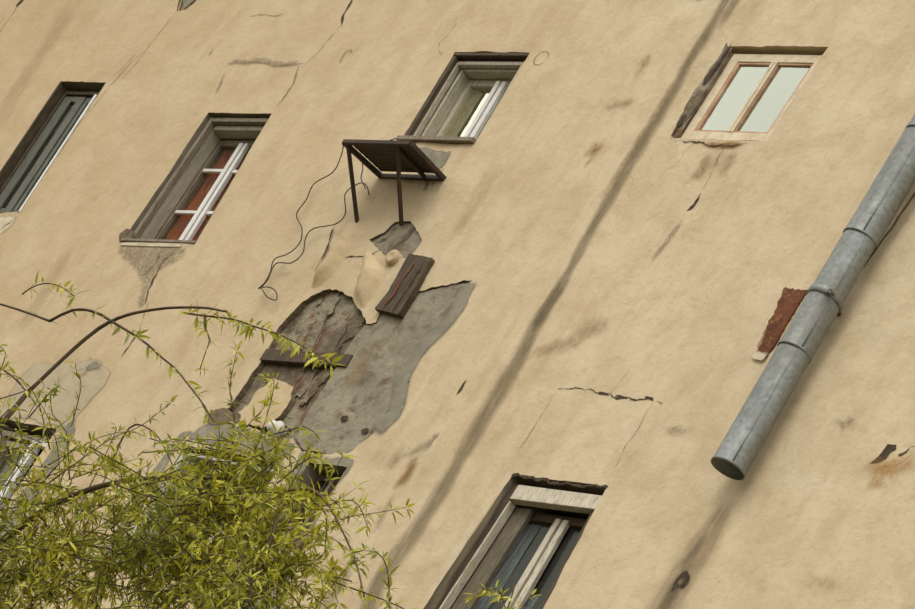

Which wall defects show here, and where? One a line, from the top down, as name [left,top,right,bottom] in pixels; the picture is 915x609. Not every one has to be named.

spalling [120,0,196,82]
crack [218,0,352,104]
spalling [671,43,732,138]
spalling [0,216,16,234]
spalling [370,221,422,258]
crack [658,149,724,252]
flaking render [206,280,475,454]
crack [511,371,663,489]